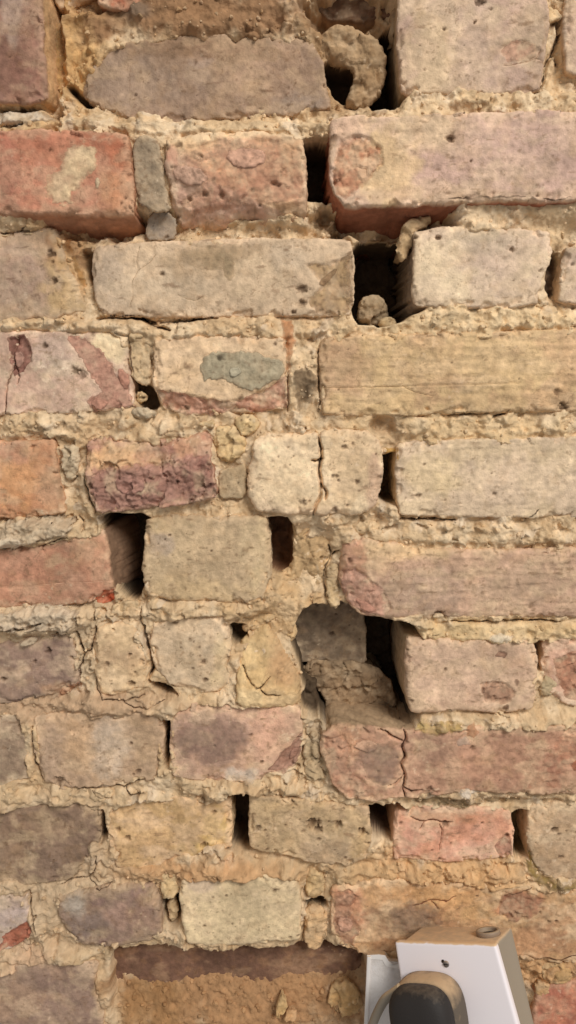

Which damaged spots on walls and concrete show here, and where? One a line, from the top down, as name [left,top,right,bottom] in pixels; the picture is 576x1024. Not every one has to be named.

spalling [324,61,353,105]
spalling [371,79,401,111]
spalling [310,241,411,324]
spalling [378,451,396,504]
spalling [269,516,295,572]
spalling [96,576,145,604]
crack [79,606,165,708]
spalling [294,638,326,717]
spalling [341,568,420,728]
crack [387,708,442,846]
spalling [369,803,391,837]
spalling [495,810,528,861]